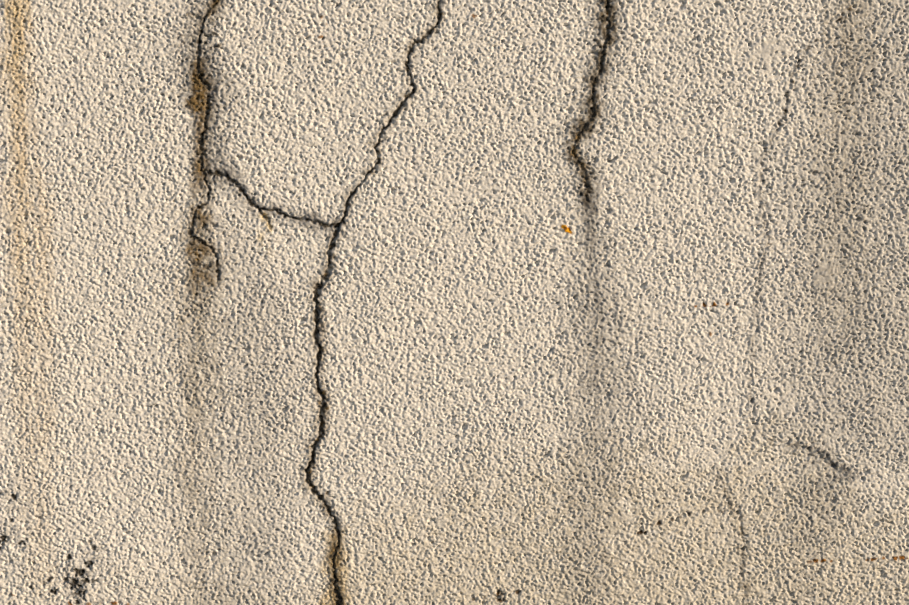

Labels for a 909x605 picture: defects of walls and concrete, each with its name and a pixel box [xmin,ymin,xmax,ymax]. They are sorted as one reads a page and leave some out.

crack [566,0,616,203]
crack [186,0,443,605]
mould [44,554,97,604]